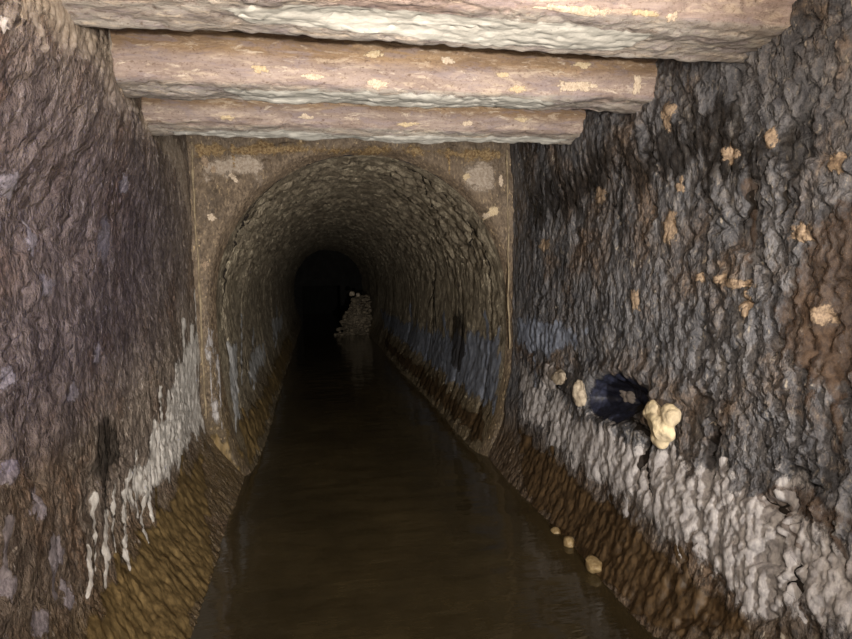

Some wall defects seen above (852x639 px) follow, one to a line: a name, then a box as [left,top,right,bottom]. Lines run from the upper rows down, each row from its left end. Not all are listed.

water stain [0,459,20,485]
water stain [28,488,47,520]
water stain [85,291,293,639]
water stain [0,515,18,602]
water stain [48,533,76,610]
water stain [30,609,49,638]